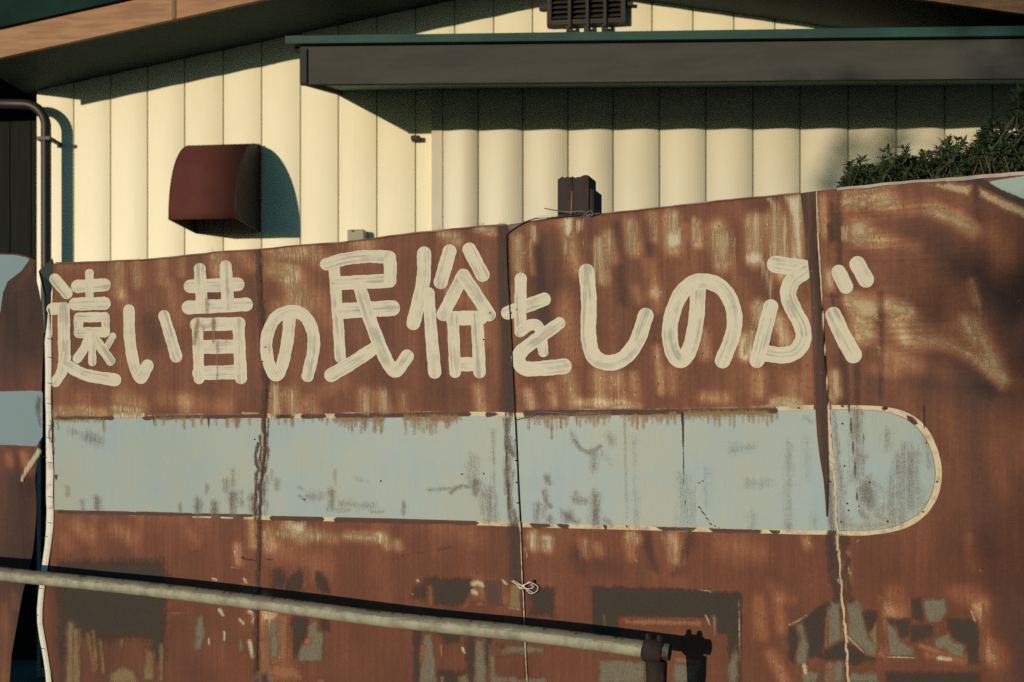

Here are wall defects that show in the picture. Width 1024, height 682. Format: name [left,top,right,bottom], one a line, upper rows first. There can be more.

corrosion [250,610,312,682]
corrosion [53,222,782,595]
peeling [463,579,521,611]
peeling [596,656,646,682]
corrosion [824,360,934,605]
peeling [789,367,1009,682]